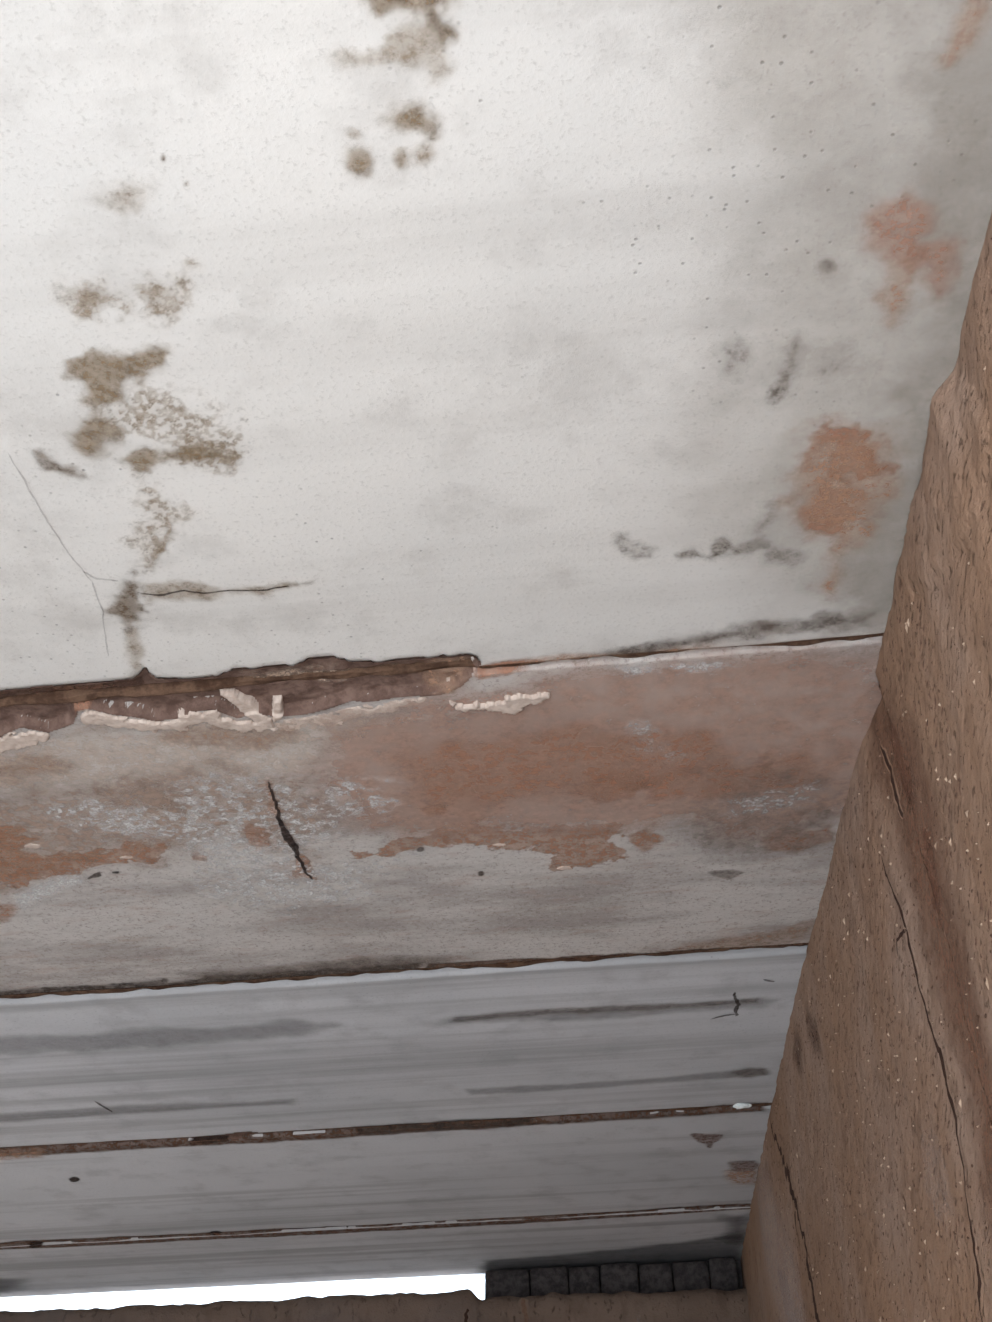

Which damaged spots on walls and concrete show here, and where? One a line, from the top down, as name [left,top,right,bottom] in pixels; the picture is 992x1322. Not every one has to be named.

leakage [371,0,455,37]
leakage [349,154,370,174]
leakage [396,107,436,137]
leakage [69,347,236,471]
corrosion [801,425,897,549]
leakage [109,583,143,665]
spalling [0,652,648,754]
crack [268,782,317,880]
crack [881,855,985,1322]
crack [769,1114,821,1322]